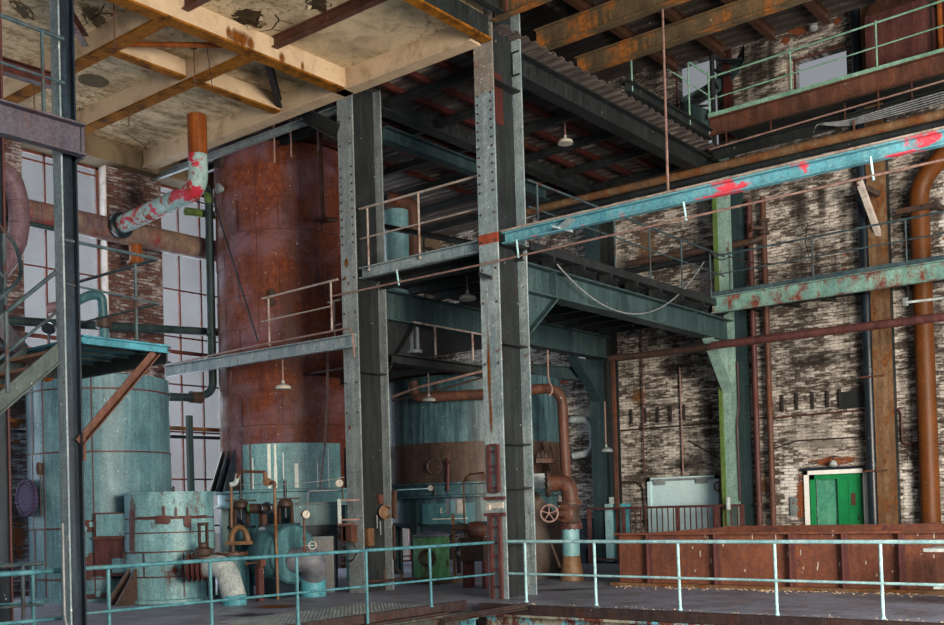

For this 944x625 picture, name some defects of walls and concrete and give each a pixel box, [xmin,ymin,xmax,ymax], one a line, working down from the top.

flaking render [9,0,35,20]
flaking render [81,5,107,28]
spalling [231,9,267,30]
spalling [305,0,332,13]